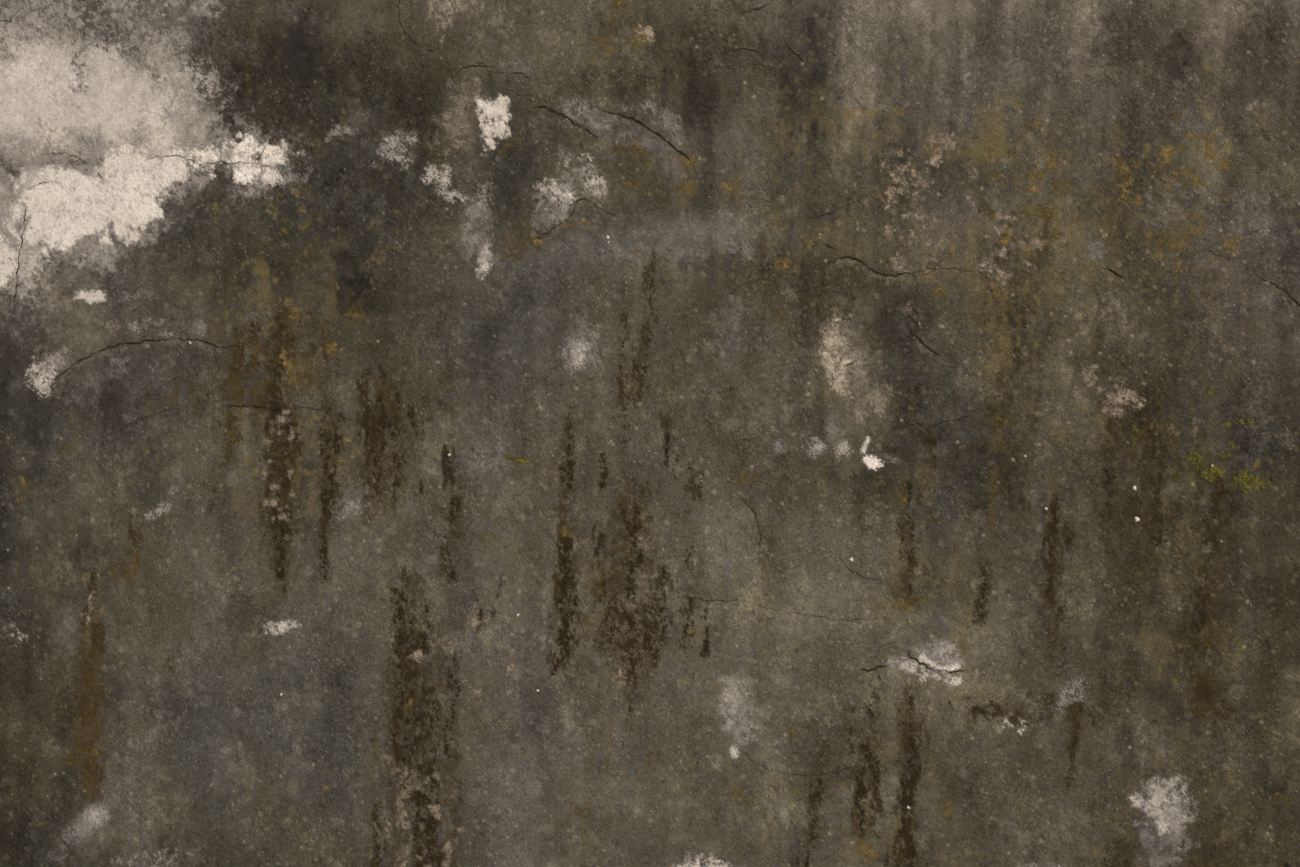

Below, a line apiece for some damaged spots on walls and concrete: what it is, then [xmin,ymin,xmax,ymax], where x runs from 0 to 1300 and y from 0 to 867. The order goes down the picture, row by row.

crack [397,0,694,166]
crack [810,191,973,299]
leakage [258,302,332,596]
leakage [317,363,425,583]
leakage [547,407,711,713]
leakage [367,566,462,867]
leakage [673,850,746,867]
leakage [716,674,764,758]
leakage [796,676,927,867]
leakage [1104,775,1199,867]